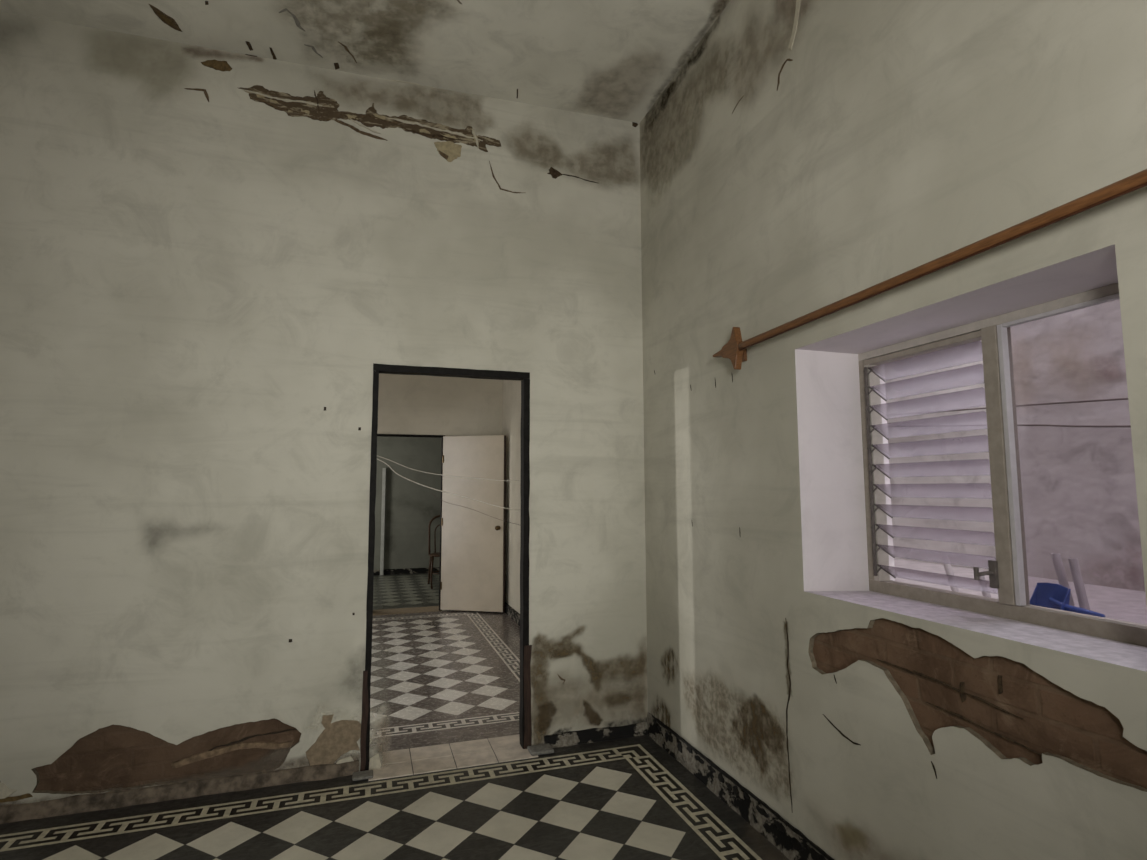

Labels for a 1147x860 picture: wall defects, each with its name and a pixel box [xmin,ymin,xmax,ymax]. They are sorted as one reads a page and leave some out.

peeling [149,4,182,32]
peeling [194,51,232,71]
peeling [279,8,340,70]
damp [788,0,801,51]
peeling [239,85,501,162]
spalling [0,706,386,803]
damp [531,628,645,745]
damp [690,683,789,787]
peeling [652,715,834,860]
crack [784,618,792,807]
spalling [808,618,1147,792]